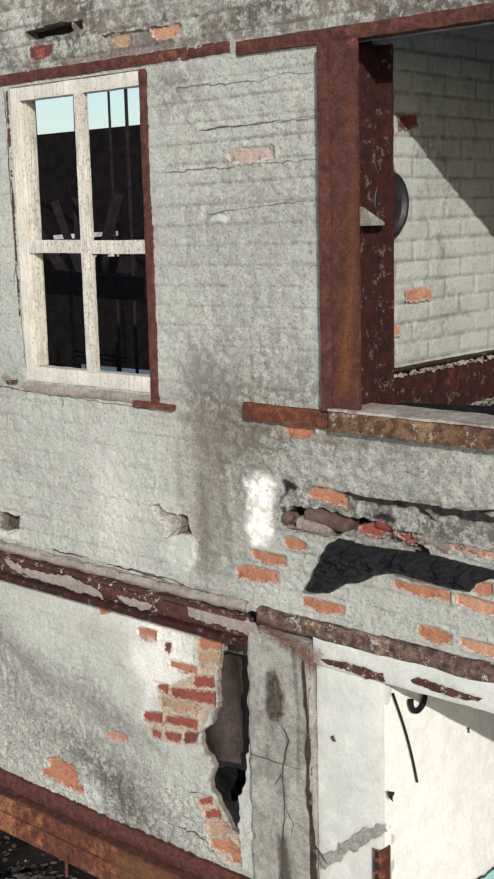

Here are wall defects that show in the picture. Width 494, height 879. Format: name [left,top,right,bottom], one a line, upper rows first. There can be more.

flaking render [28,25,74,60]
water stain [244,473,276,547]
spalling [236,486,431,585]
peeling [3,558,111,615]
peeling [117,595,153,610]
corrosion [267,623,320,666]
spalling [187,597,494,683]
spalling [136,627,222,746]
spalling [266,671,285,721]
spalling [411,677,483,701]
flaking render [40,757,84,795]
crack [249,661,328,879]